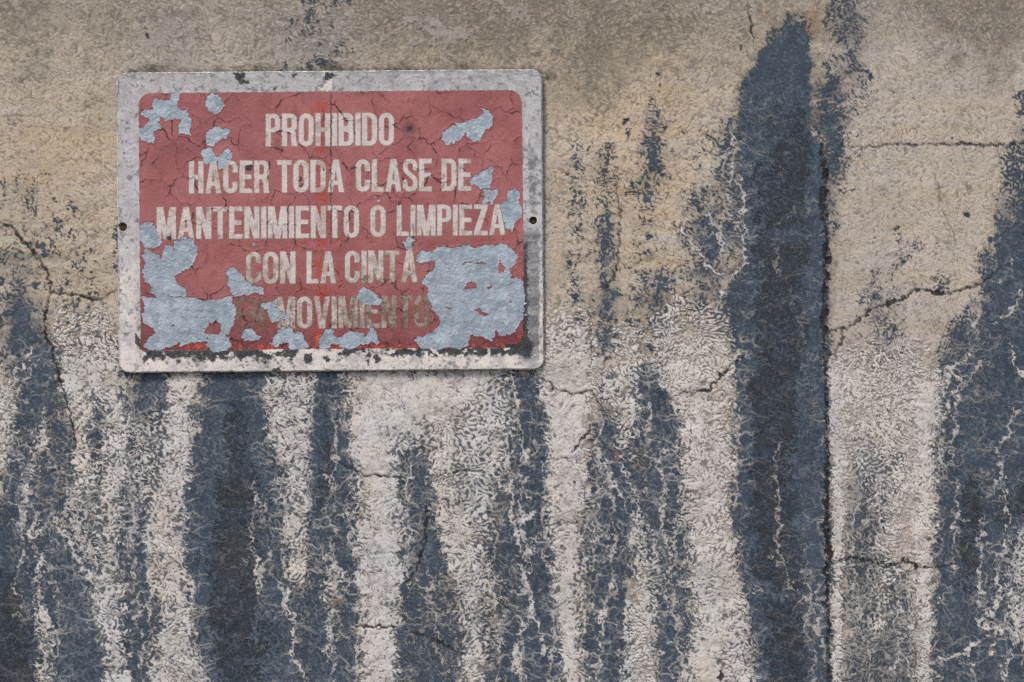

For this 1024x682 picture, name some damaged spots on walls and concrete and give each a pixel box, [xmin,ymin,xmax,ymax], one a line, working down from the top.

leakage [13,173,49,232]
leakage [28,213,79,259]
crack [3,223,117,449]
leakage [67,248,100,296]
leakage [565,250,584,304]
leakage [566,141,592,242]
leakage [624,97,675,263]
leakage [857,269,903,346]
leakage [891,226,922,297]
crack [819,142,1021,682]